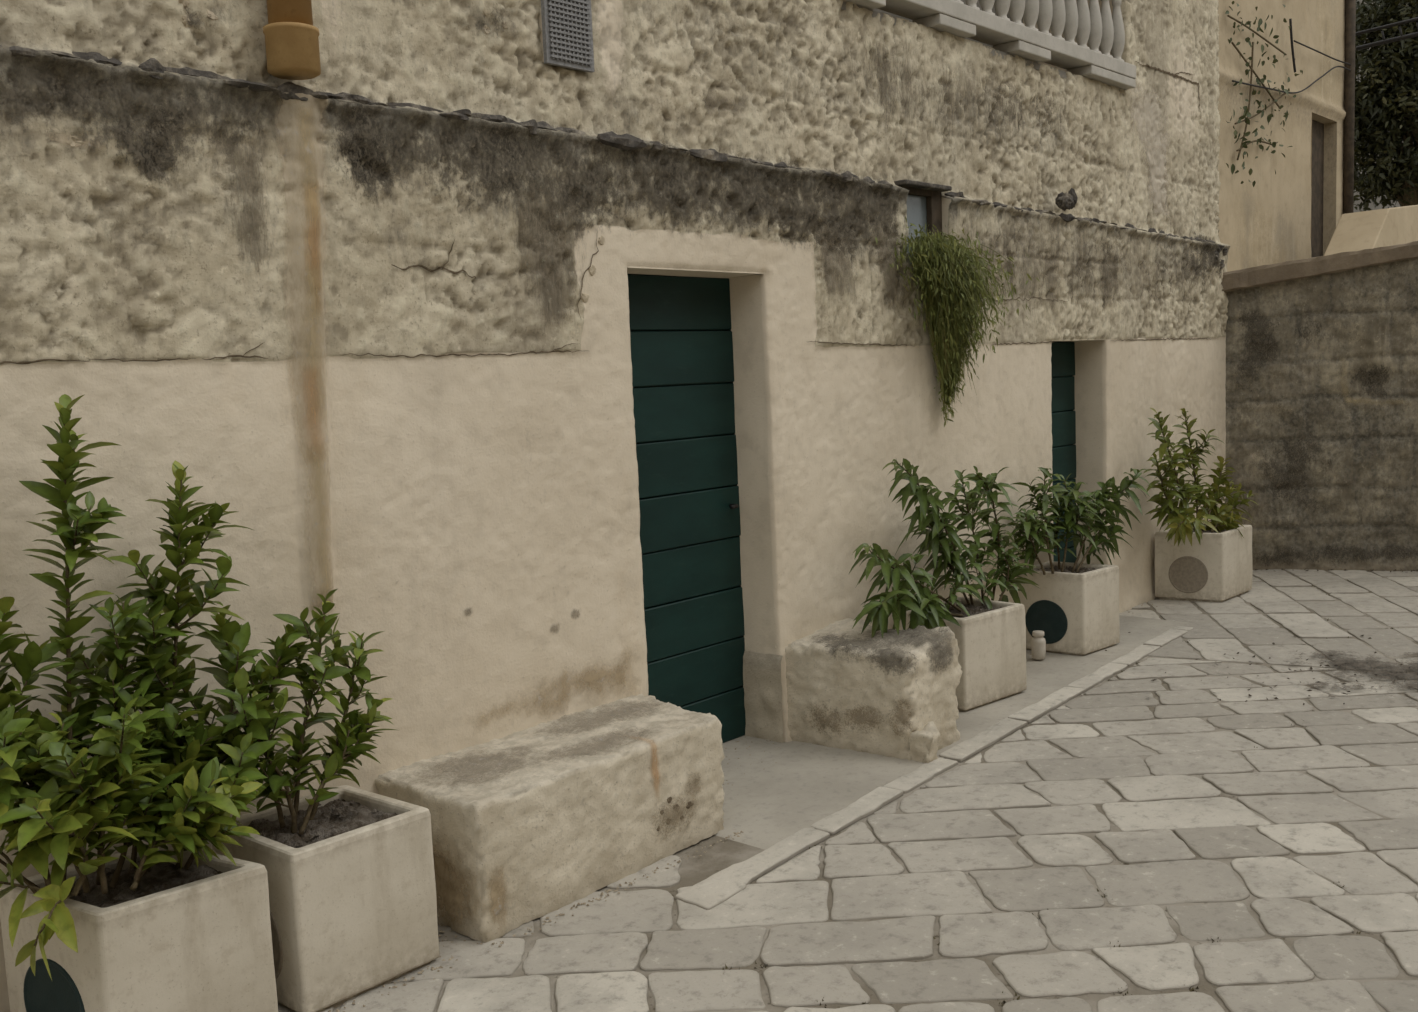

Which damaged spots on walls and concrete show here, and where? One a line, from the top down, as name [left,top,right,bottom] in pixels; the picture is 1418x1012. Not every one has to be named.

leakage [0,56,267,270]
crack [393,240,476,278]
leakage [331,100,905,323]
leakage [866,50,1051,126]